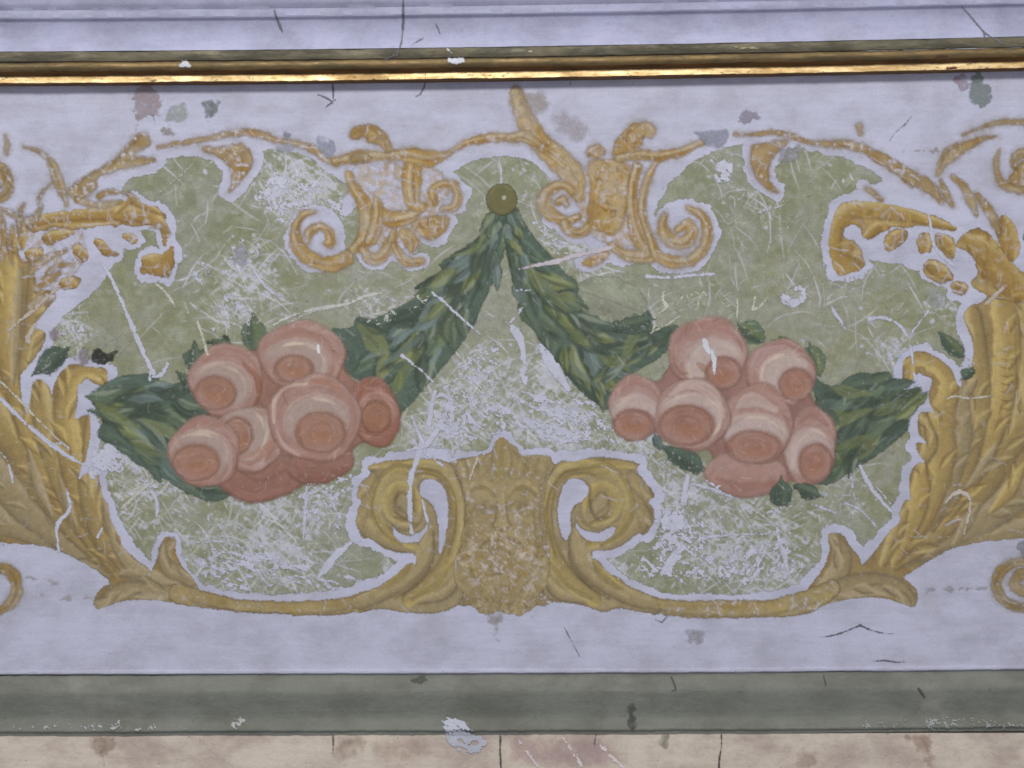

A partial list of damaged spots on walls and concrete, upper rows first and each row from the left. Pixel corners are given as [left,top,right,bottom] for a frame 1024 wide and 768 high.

crack [385,0,440,60]
peeling [435,341,615,446]
peeling [88,442,171,493]
peeling [292,475,353,532]
peeling [185,540,359,592]
peeling [626,502,807,587]
crack [827,624,892,637]
peeling [441,717,487,753]